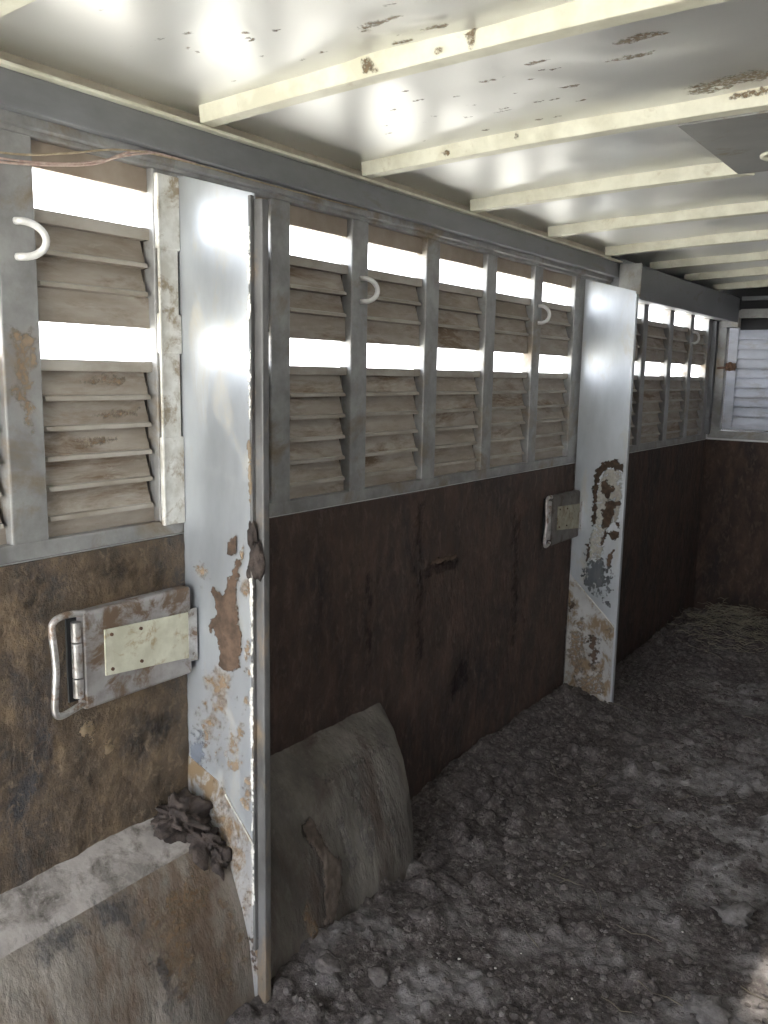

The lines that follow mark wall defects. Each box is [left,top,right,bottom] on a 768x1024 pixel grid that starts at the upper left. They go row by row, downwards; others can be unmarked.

peeling [605,50,655,62]
peeling [689,86,768,100]
peeling [227,535,244,560]
peeling [584,459,624,567]
rust [567,600,611,695]
rust [202,668,251,810]